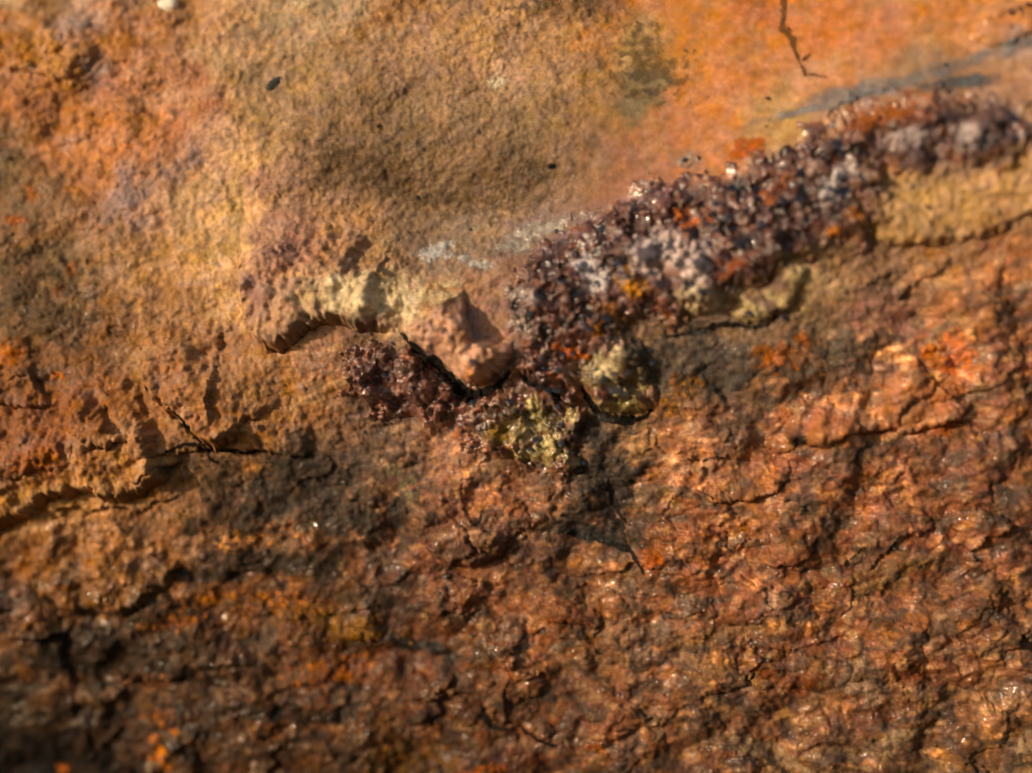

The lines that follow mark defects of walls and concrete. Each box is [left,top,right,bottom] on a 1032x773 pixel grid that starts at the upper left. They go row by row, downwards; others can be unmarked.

crack [779,0,827,78]
crack [828,88,889,117]
corrosion [730,138,764,158]
corrosion [674,208,709,232]
corrosion [753,330,811,375]
corrosion [920,328,977,378]
crack [140,348,269,464]
hole [460,392,477,404]
peeling [690,339,973,505]
corrosion [208,530,299,553]
corrosion [136,582,412,690]
corrosion [141,710,180,771]